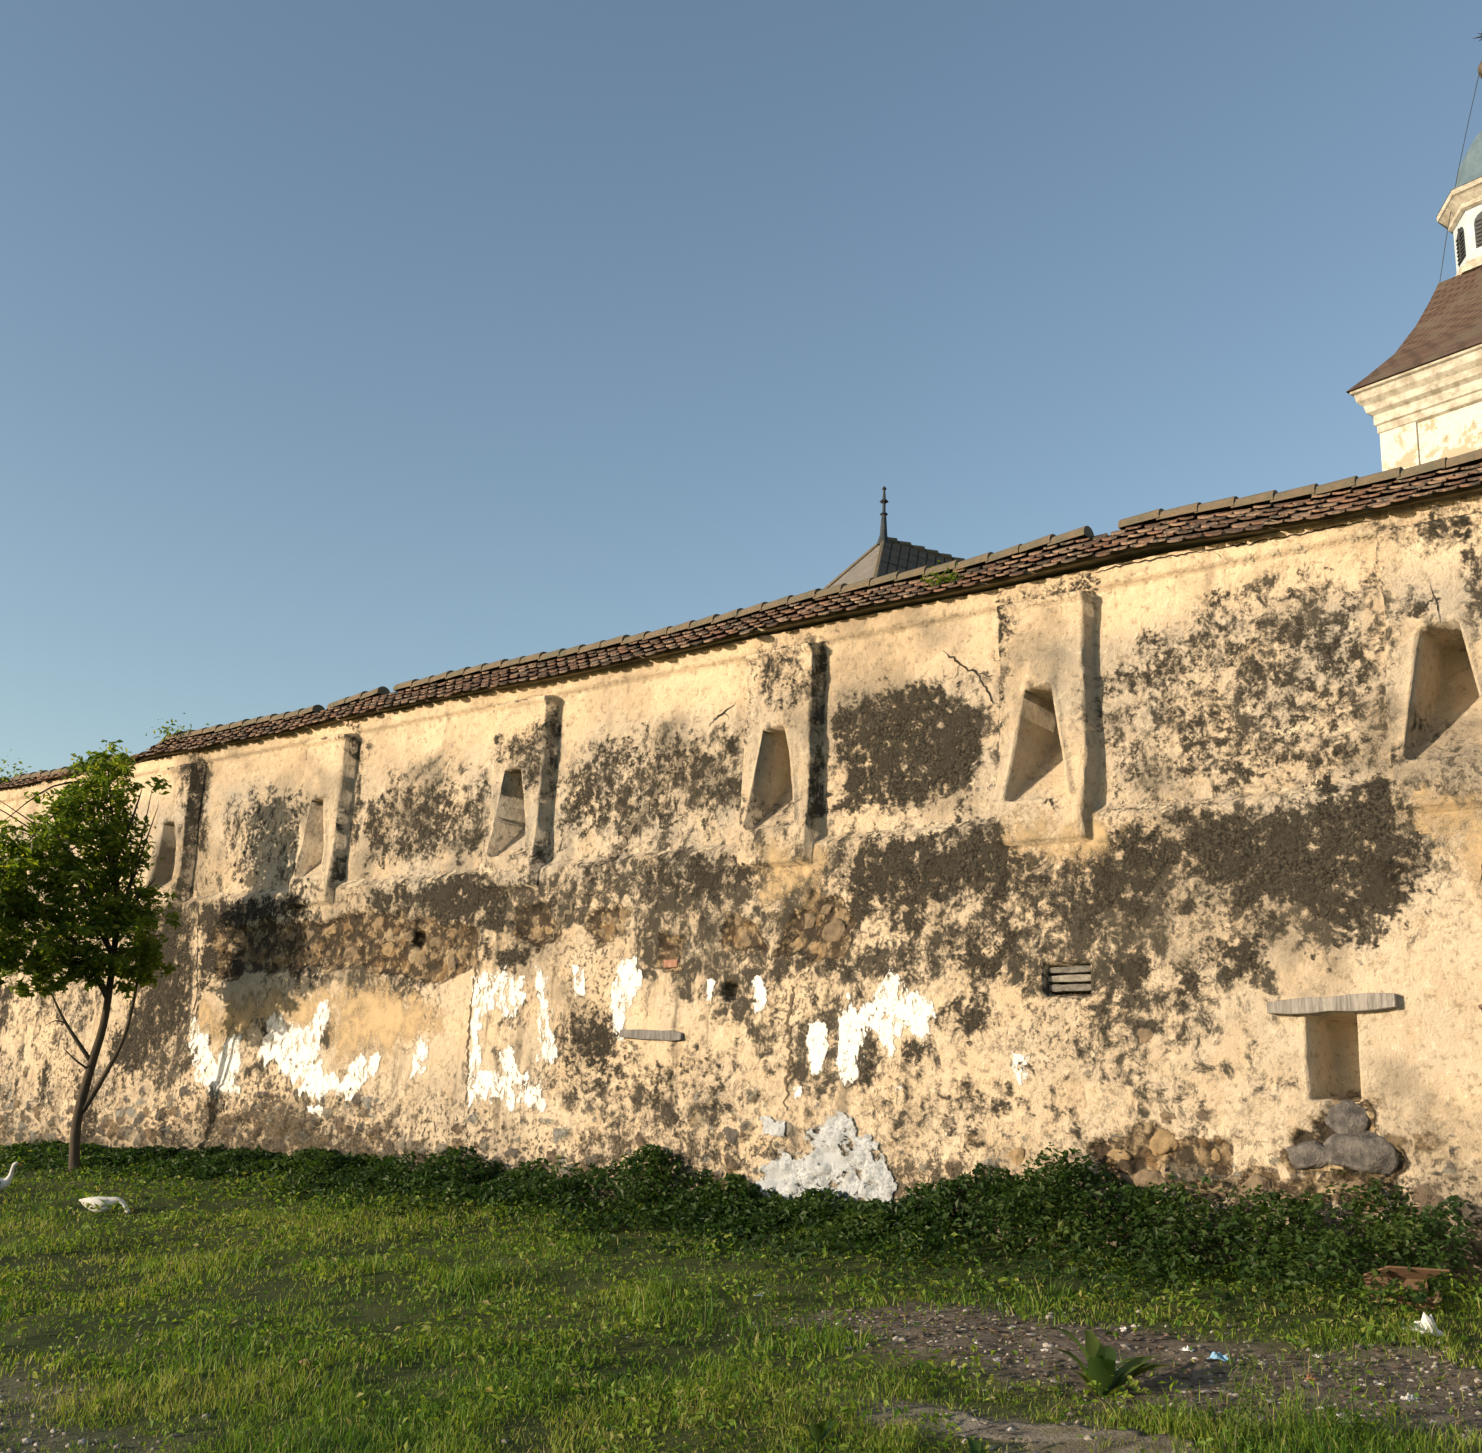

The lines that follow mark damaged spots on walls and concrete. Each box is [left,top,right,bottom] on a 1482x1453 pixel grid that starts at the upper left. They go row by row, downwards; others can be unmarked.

flaking render [578,892,632,949]
flaking render [142,862,562,1117]
peeling [572,964,586,997]
peeling [587,837,936,1099]
peeling [1012,1051,1030,1087]
peeling [759,1115,785,1138]